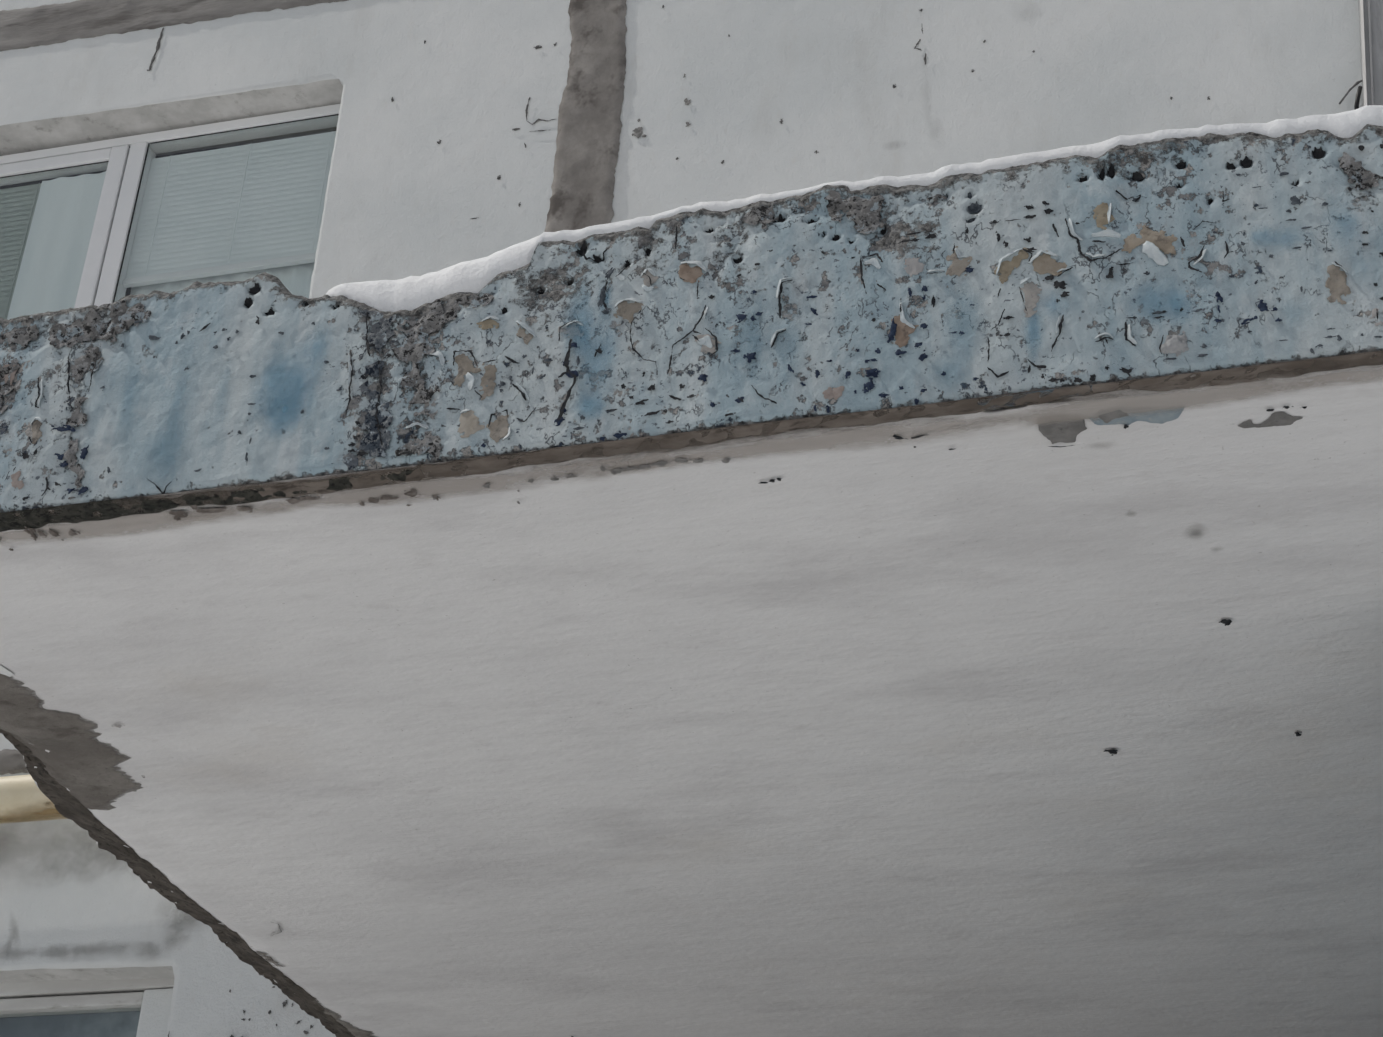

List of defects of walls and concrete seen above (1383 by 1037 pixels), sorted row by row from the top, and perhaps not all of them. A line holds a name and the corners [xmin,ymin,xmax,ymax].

spalling [1077,163,1115,183]
spalling [1226,156,1252,176]
spalling [1312,144,1383,191]
peeling [1075,203,1178,278]
spalling [244,283,275,325]
peeling [576,241,744,424]
spalling [788,190,1073,413]
spalling [0,300,190,501]
spalling [324,293,585,471]
leakage [0,350,1383,541]
peeling [1037,406,1185,447]
peeling [1238,406,1307,428]